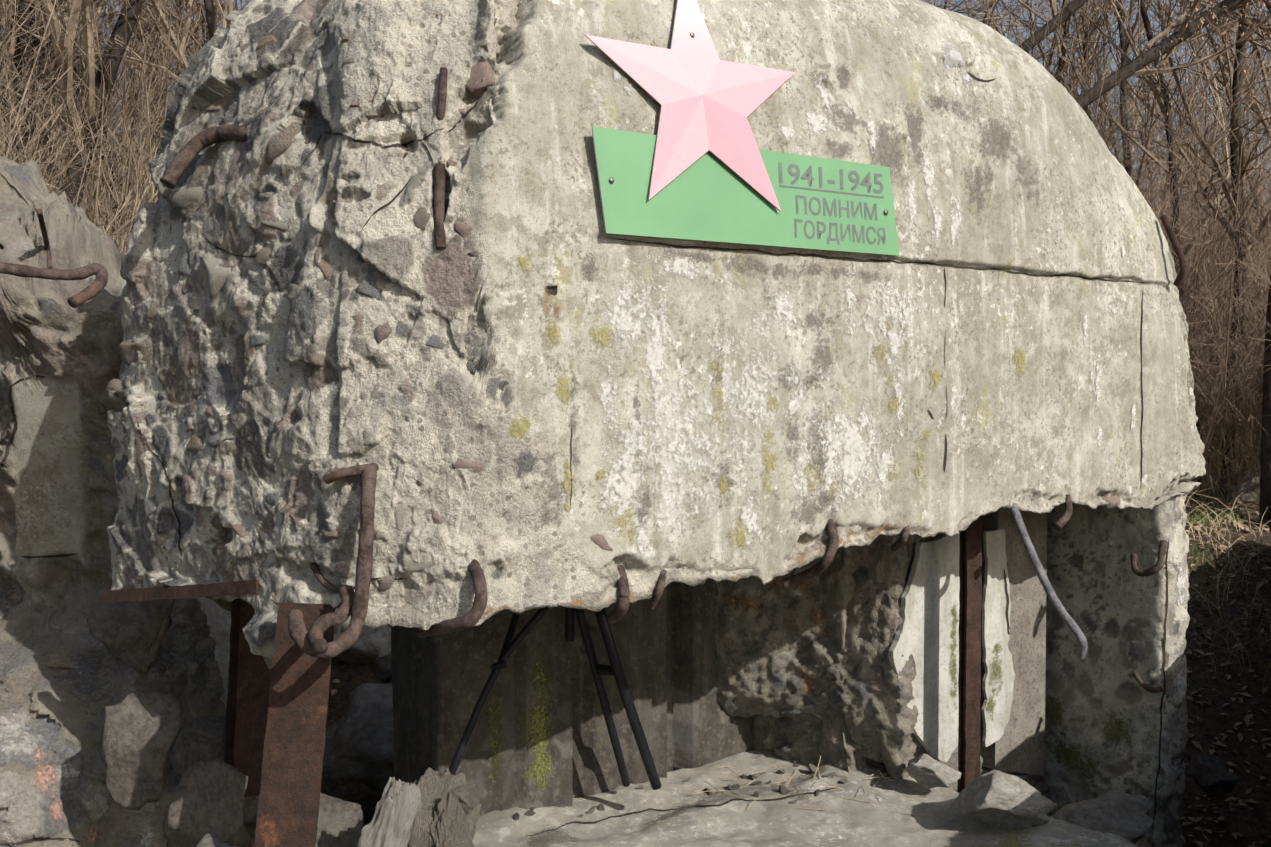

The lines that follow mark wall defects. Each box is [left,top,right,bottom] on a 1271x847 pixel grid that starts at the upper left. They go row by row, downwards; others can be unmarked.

crack [302,98,479,229]
spalling [433,67,499,250]
crack [203,237,257,258]
crack [0,375,45,475]
crack [136,419,182,558]
spalling [287,463,379,658]
spalling [415,559,502,638]
spalling [606,565,632,624]
spalling [647,570,683,610]
spalling [782,519,841,588]
peeling [888,526,960,762]
peeling [981,503,1088,747]